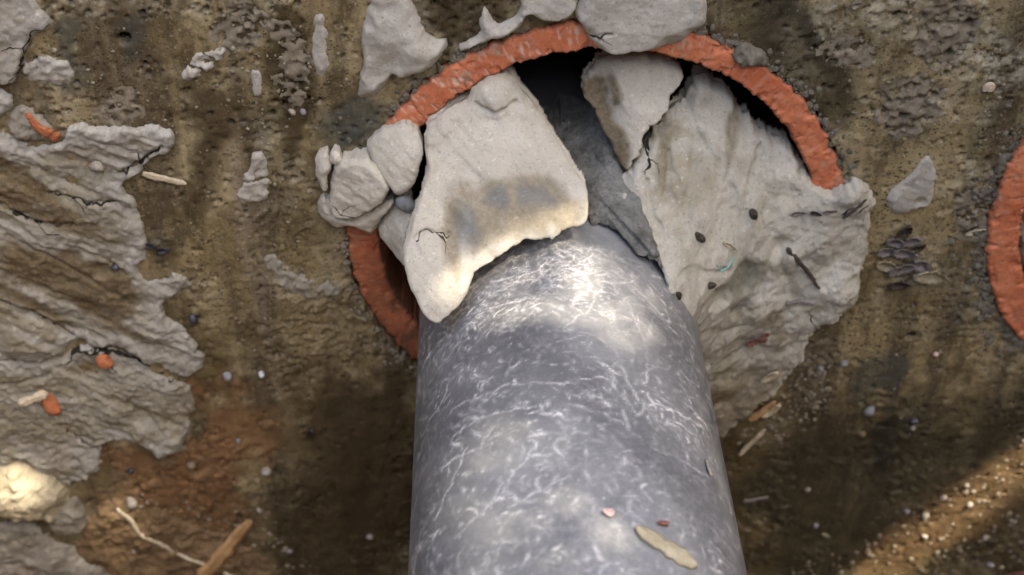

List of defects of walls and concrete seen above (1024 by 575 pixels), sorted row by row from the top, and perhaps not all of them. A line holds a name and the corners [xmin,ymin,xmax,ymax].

spalling [815,33,876,69]
crack [118,145,161,175]
crack [644,132,659,173]
crack [416,229,450,253]
crack [0,299,175,383]